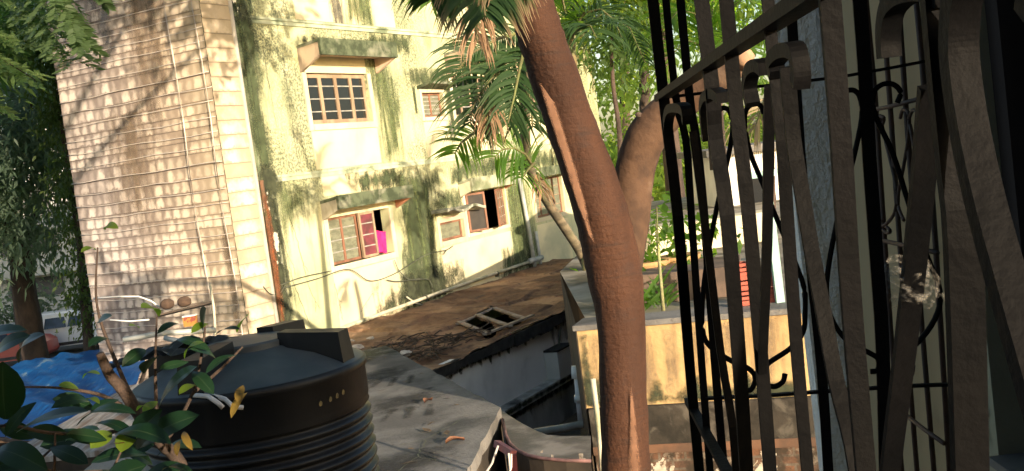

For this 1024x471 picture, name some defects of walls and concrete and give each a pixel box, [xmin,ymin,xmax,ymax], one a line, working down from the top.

water stain [233,0,261,150]
water stain [332,0,411,53]
water stain [374,61,399,153]
corrosion [265,198,284,320]
water stain [257,164,294,321]
water stain [377,157,515,313]
peeling [651,458,675,471]